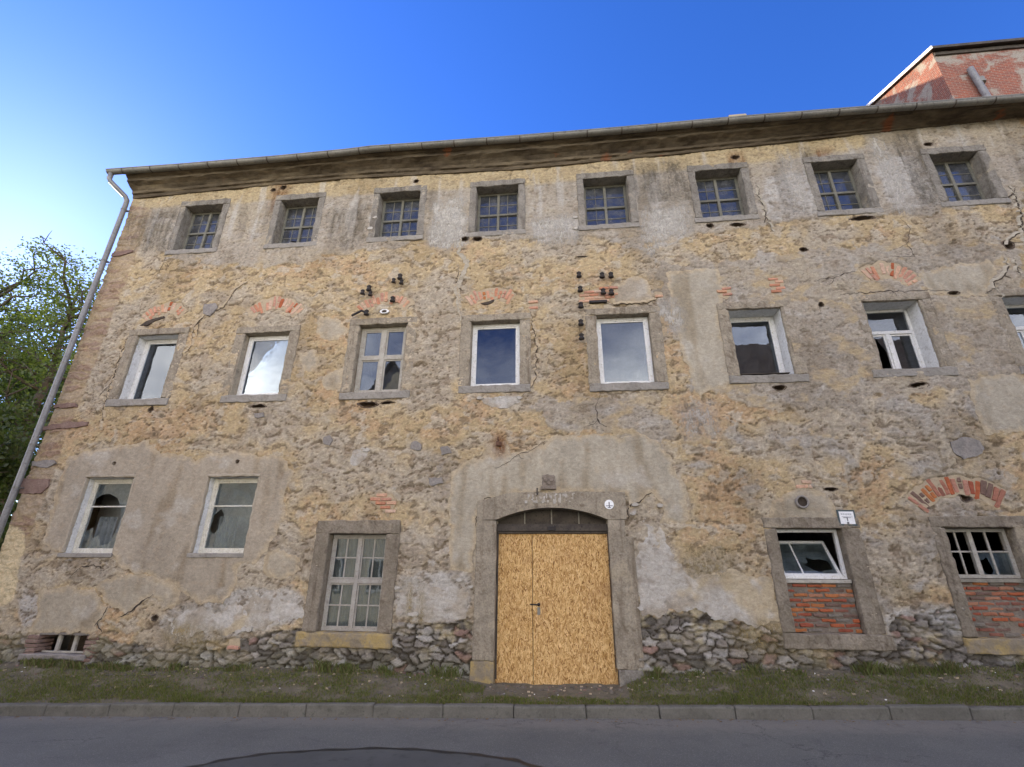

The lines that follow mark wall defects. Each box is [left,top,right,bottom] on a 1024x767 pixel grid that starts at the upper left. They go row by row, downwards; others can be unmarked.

crack [985,185,1024,298]
crack [819,271,949,296]
flaking render [250,296,303,315]
spalling [250,404,267,418]
flaking render [908,477,1006,513]
flaking render [630,502,780,628]
crack [95,596,151,632]
flaking render [151,591,304,650]